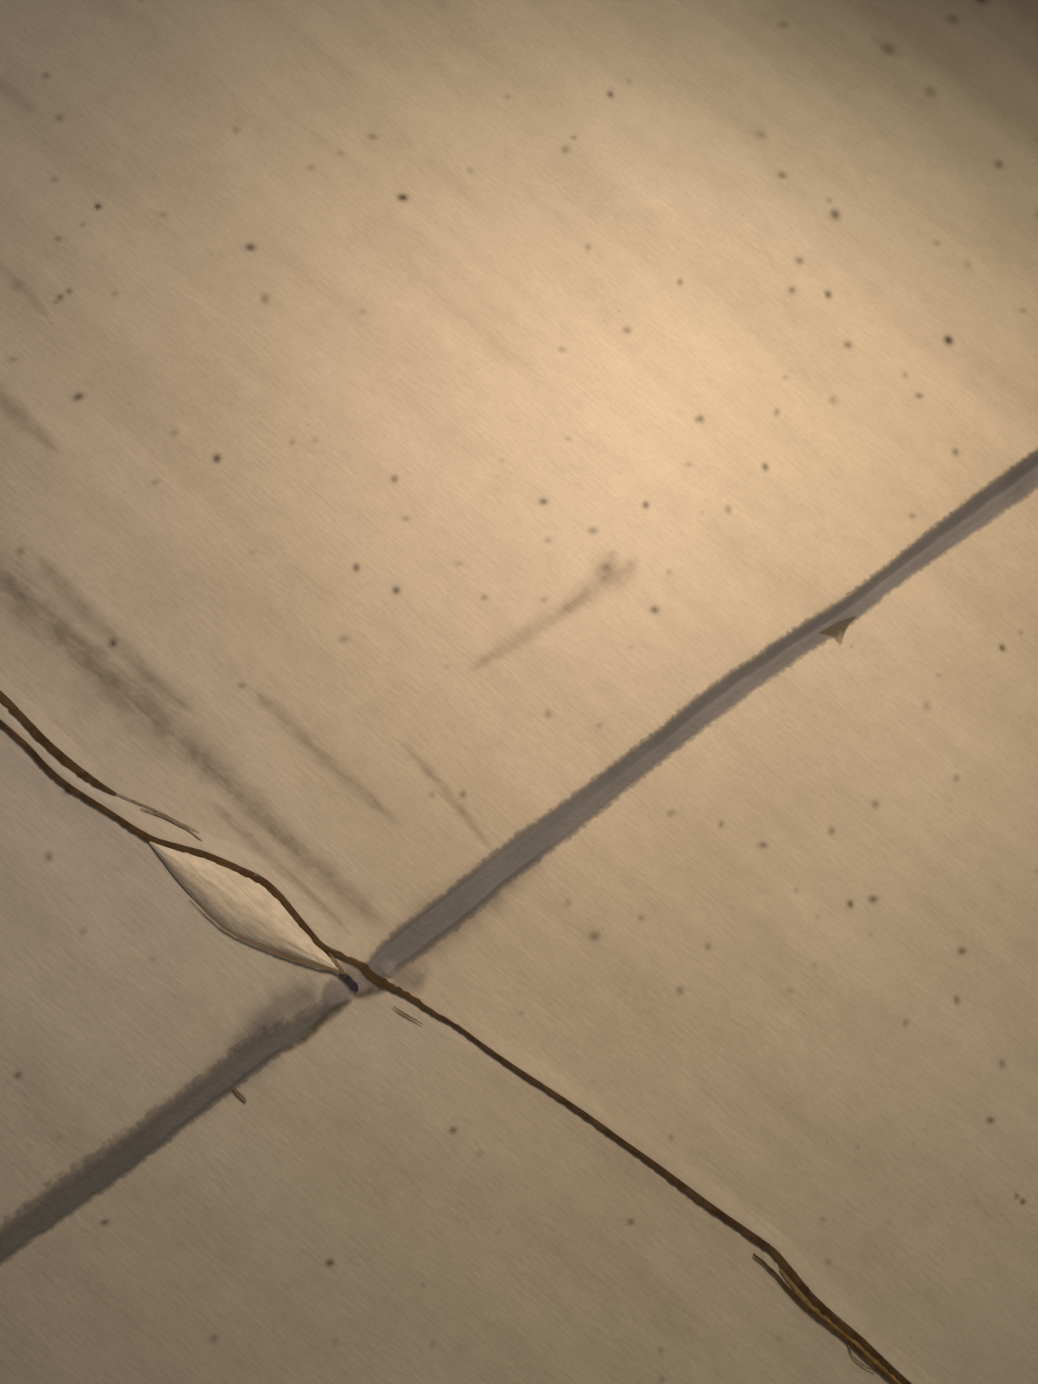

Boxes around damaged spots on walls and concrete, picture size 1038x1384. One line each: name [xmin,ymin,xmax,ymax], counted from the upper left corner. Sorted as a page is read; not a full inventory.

crack [0,672,939,1384]